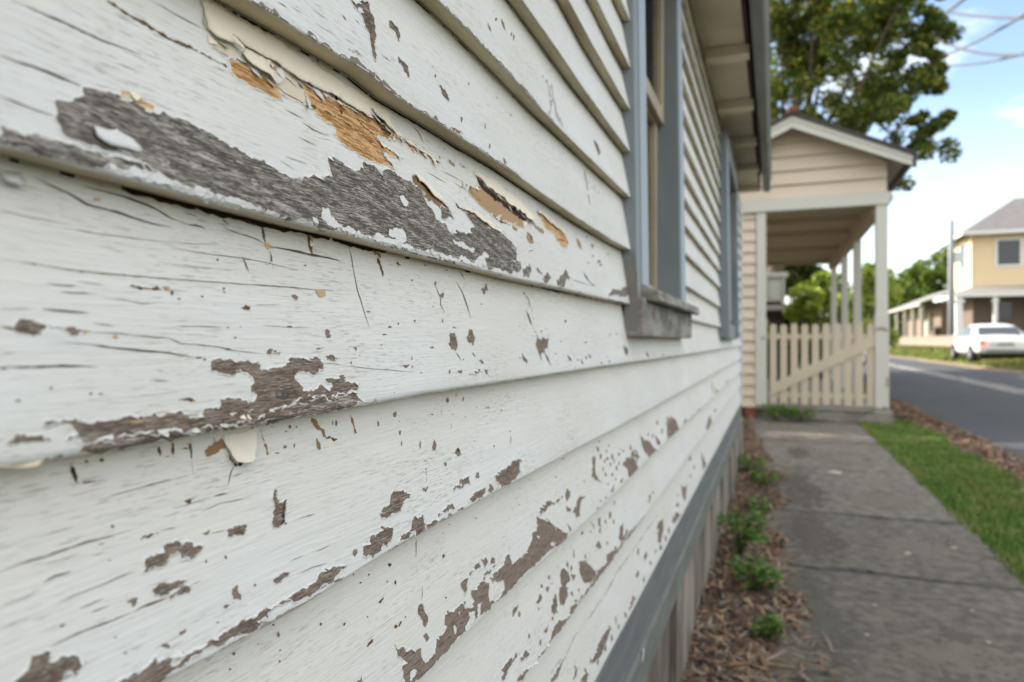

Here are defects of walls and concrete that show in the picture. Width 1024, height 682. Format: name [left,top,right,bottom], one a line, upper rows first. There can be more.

peeling [0,0,570,288]
crack [0,178,384,369]
peeling [0,347,365,468]
peeling [11,648,88,682]
peeling [115,458,523,682]
peeling [394,407,716,682]